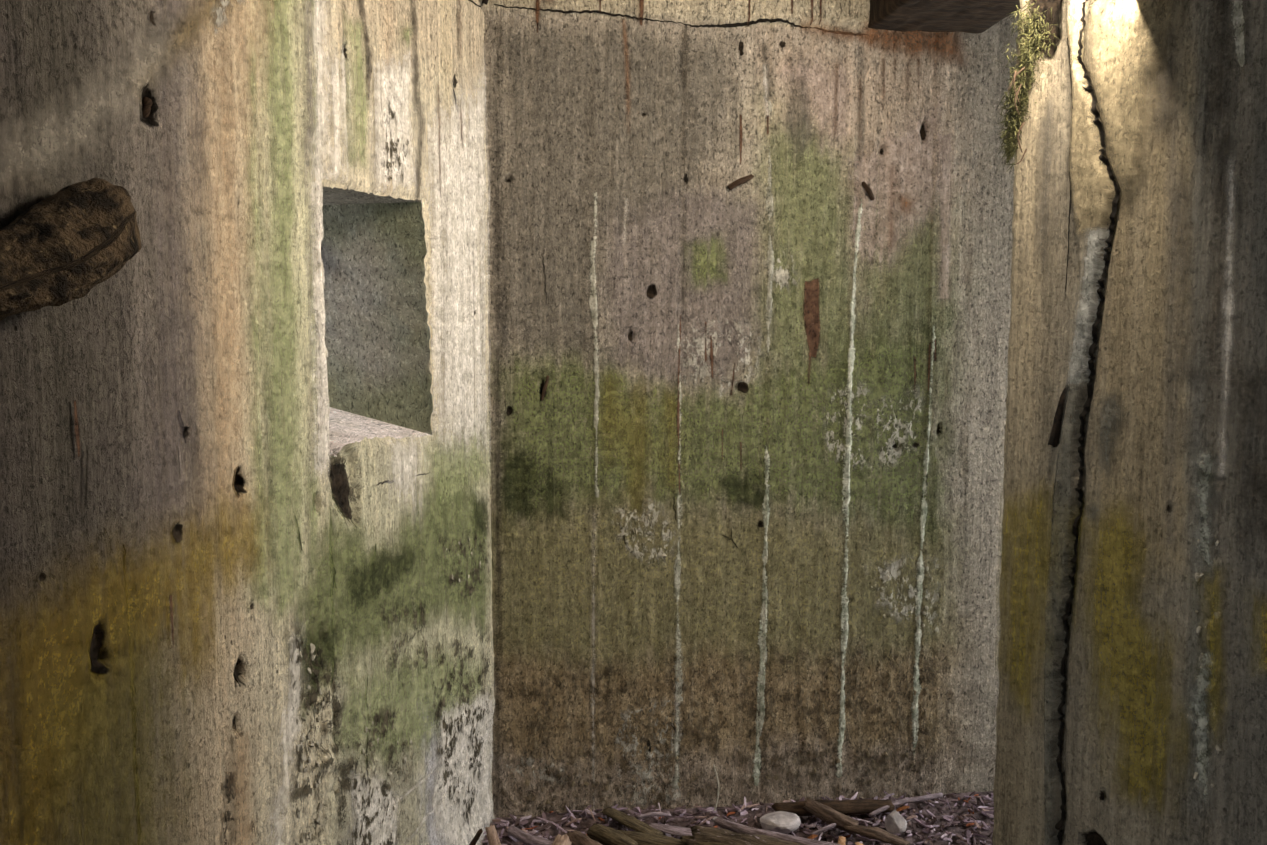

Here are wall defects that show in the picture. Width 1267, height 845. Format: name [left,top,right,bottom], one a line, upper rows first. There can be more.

crack [469,0,867,36]
water stain [784,66,846,131]
water stain [1217,132,1233,239]
water stain [1207,0,1245,117]
water stain [589,192,600,497]
water stain [677,236,795,464]
rust [803,278,820,384]
water stain [826,115,950,778]
crack [1052,0,1121,845]
water stain [1210,257,1232,355]
water stain [616,481,683,805]
water stain [752,445,770,786]